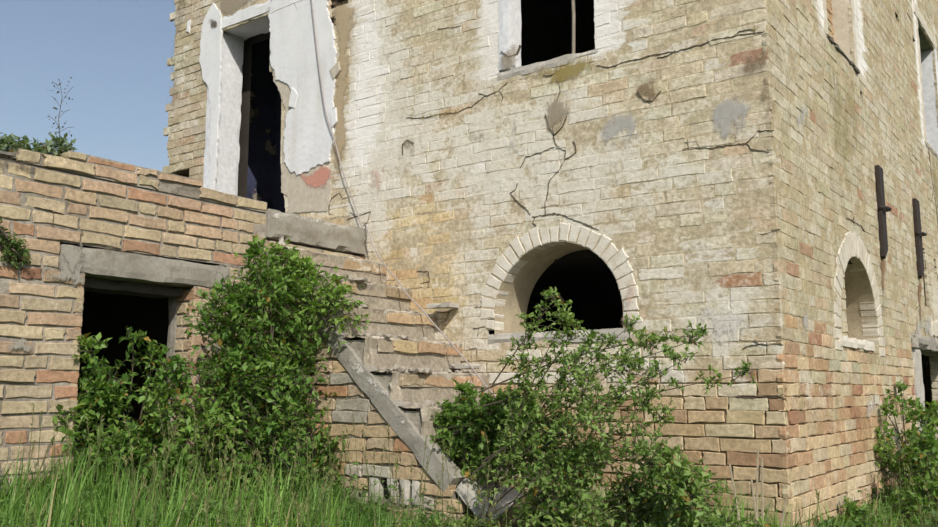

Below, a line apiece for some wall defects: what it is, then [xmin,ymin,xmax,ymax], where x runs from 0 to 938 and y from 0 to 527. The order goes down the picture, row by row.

flaking render [186,0,252,190]
flaking render [264,0,355,213]
crack [407,82,508,118]
crack [510,125,599,230]
crack [596,29,764,68]
crack [683,130,774,152]